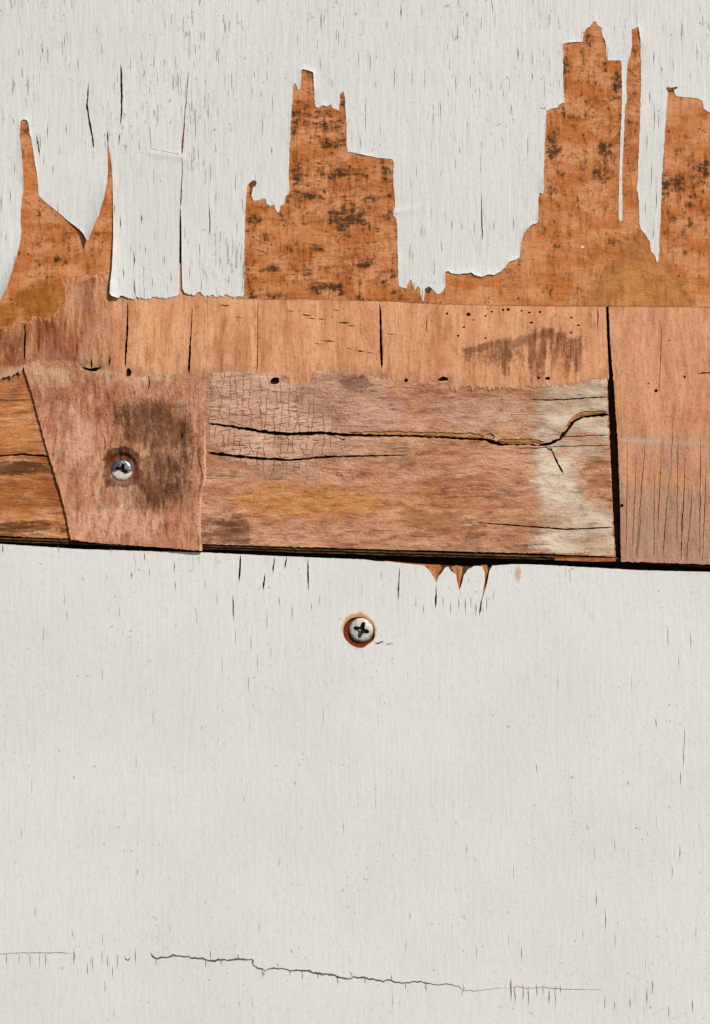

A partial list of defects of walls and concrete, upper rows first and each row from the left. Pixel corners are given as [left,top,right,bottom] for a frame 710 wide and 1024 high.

peeling [237,21,710,307]
peeling [0,119,113,332]
water stain [117,404,199,508]
crack [207,397,610,473]
peeling [388,561,463,590]
corrosion [343,612,376,648]
crack [6,933,693,1019]